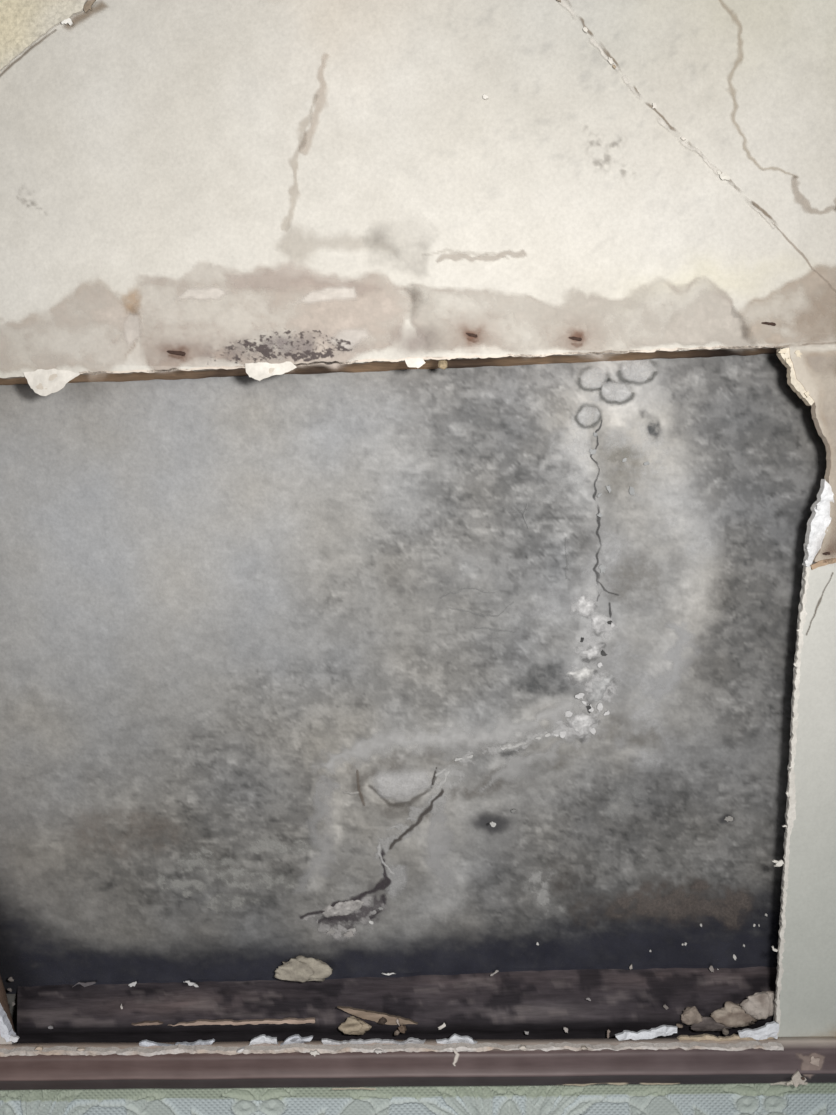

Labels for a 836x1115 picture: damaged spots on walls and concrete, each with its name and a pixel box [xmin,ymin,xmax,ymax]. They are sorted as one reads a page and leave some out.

crack [556,0,836,292]
leakage [153,357,180,372]
leakage [214,267,836,368]
flaking render [776,348,814,406]
crack [589,420,650,618]
flaking render [802,479,834,567]
leakage [157,701,576,911]
crack [300,767,450,919]
spalling [304,595,617,941]
leakage [0,920,296,994]
leakage [312,880,781,980]
flaking render [0,1006,784,1057]